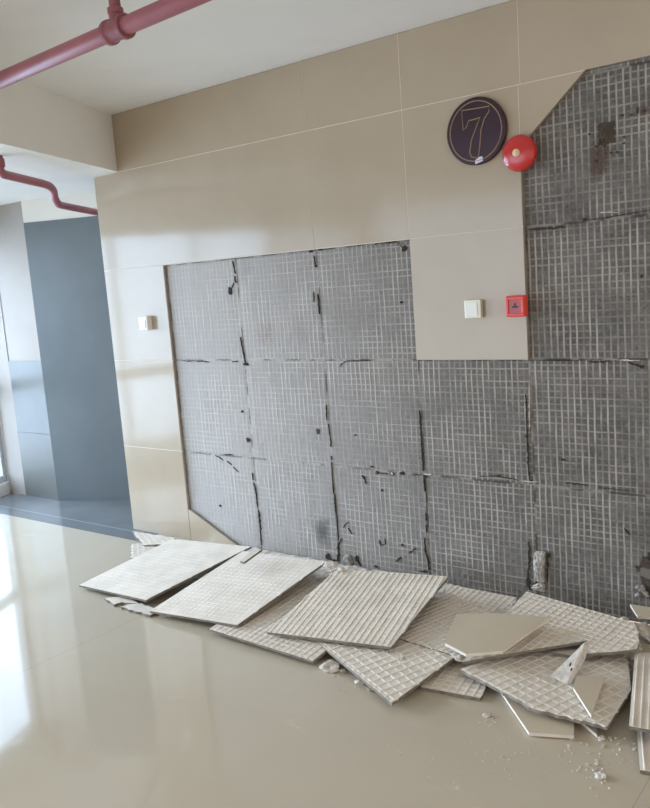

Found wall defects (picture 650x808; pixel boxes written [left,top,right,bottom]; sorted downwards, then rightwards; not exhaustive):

spalling [588,114,633,162]
spalling [240,549,262,564]